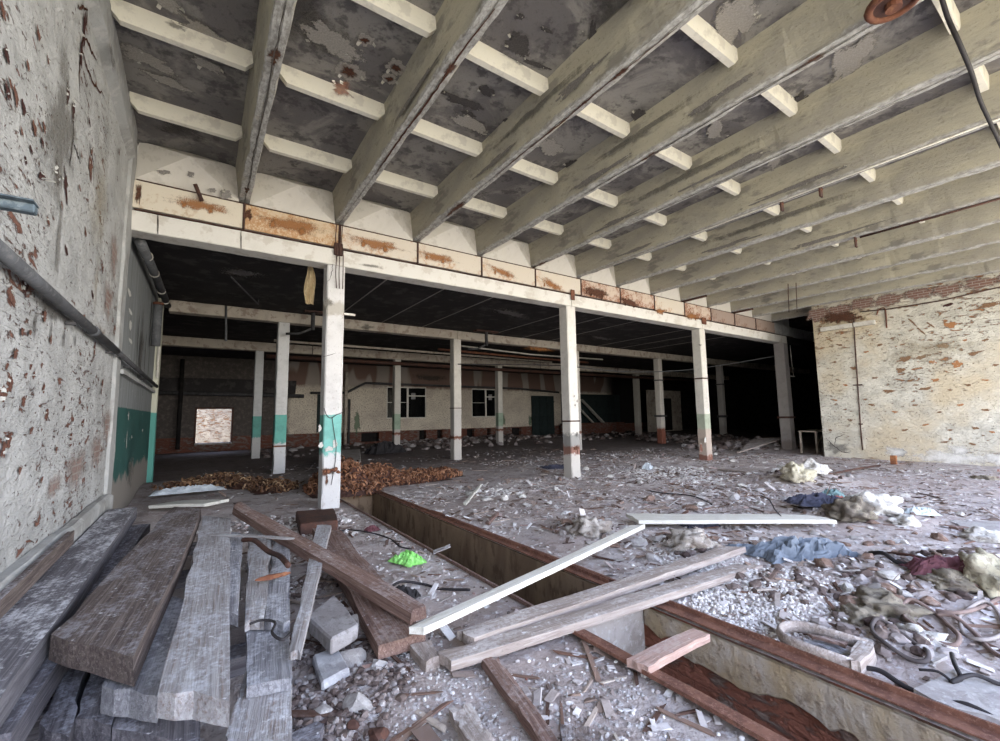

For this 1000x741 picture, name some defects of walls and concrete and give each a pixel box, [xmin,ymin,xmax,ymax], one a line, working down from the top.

rust [332,80,353,98]
peeling [3,44,48,164]
peeling [38,151,93,210]
rust [177,197,227,214]
rust [245,209,327,236]
rust [346,233,400,252]
rust [423,252,453,263]
peeling [7,280,29,305]
rust [586,287,608,299]
flaking render [808,275,1000,323]
peeling [896,319,958,390]
peeling [0,348,45,402]